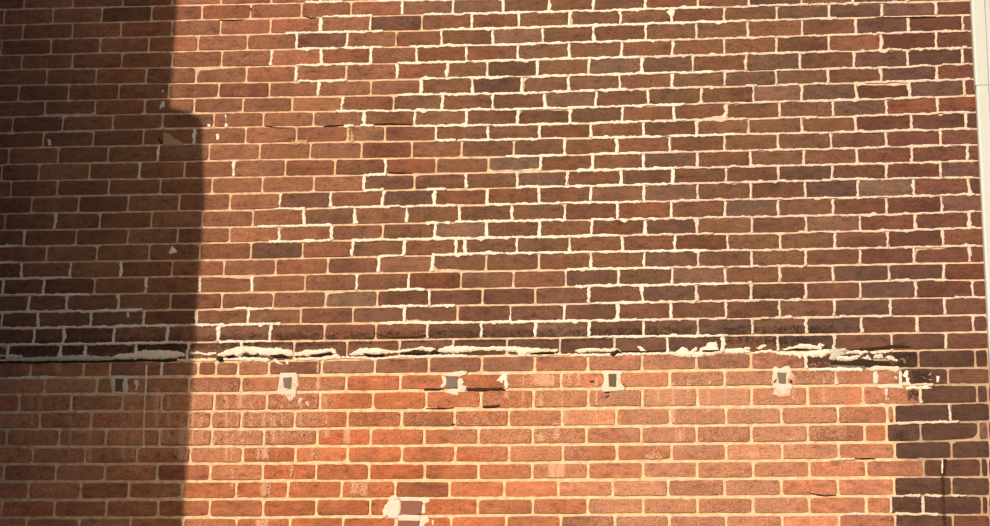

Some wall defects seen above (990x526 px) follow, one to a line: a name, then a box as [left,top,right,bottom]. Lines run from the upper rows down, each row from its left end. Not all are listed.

crack [363,331,440,357]
crack [0,357,177,365]
crack [217,352,332,362]
crack [610,349,666,357]
crack [849,345,910,364]